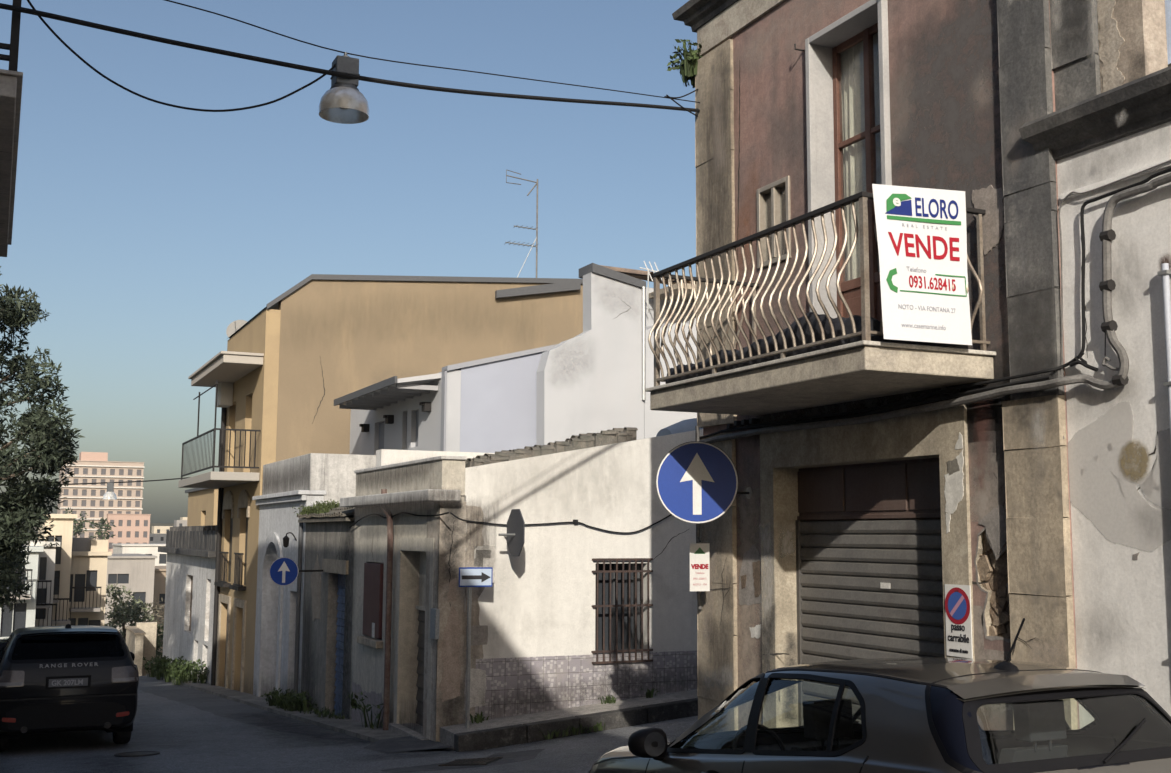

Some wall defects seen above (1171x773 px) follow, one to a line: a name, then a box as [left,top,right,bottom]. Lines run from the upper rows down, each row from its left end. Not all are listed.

flaking render [944,411,1011,660]
leakage [1120,441,1149,480]